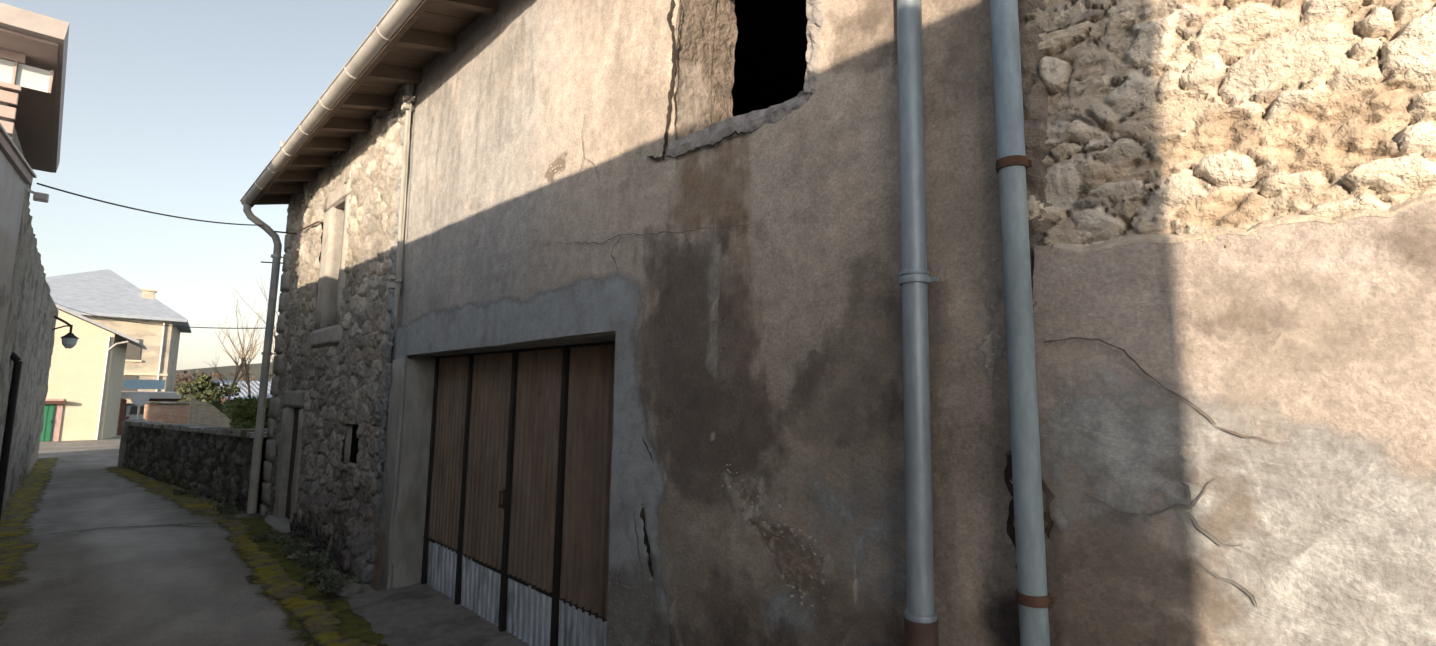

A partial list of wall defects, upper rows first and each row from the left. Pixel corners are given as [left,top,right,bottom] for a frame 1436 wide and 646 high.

crack [647,0,758,161]
leakage [642,236,784,500]
crack [1043,337,1279,444]
crack [634,507,653,578]
flaking render [1004,452,1017,570]
flaking render [1042,479,1055,539]
crack [1076,479,1257,607]